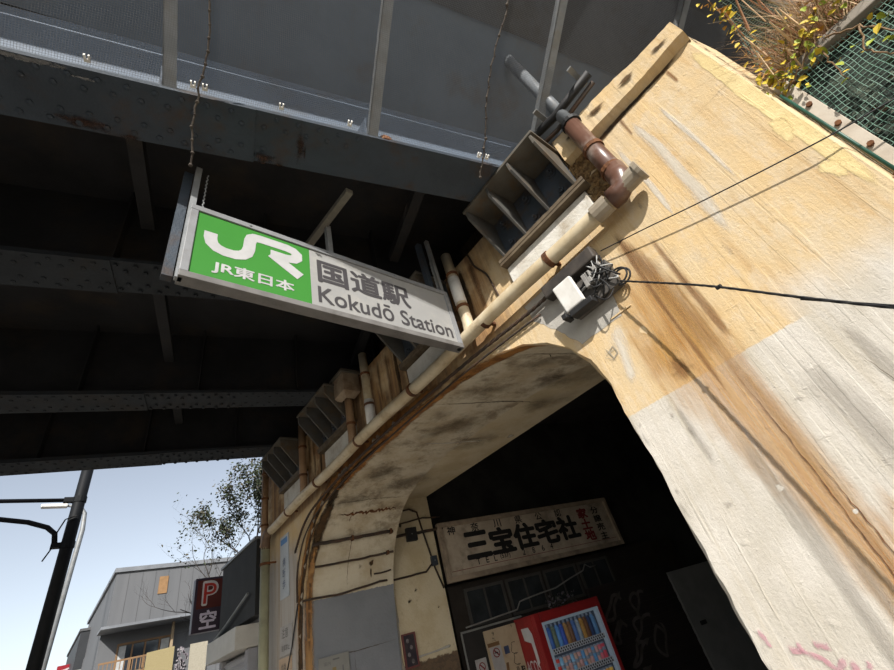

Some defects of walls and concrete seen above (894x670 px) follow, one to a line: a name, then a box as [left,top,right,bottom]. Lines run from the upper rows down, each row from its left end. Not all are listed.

corrosion [298,345,546,670]
corrosion [619,242,894,597]
crack [718,352,894,575]